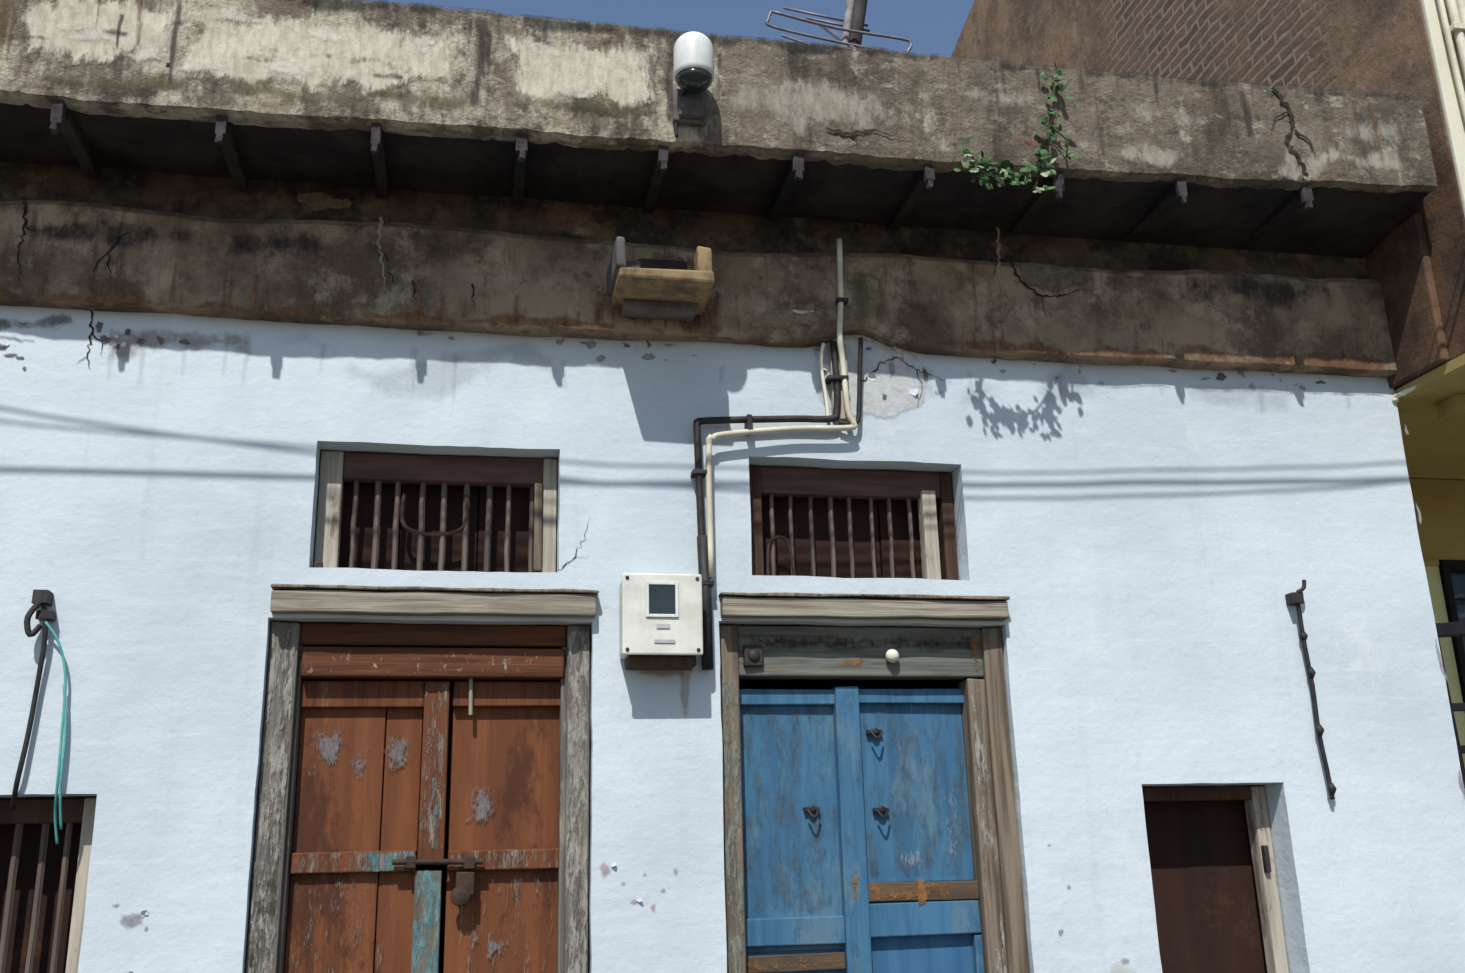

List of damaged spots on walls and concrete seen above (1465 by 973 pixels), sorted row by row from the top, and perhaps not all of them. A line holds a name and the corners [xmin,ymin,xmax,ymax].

leakage [169,3,181,83]
leakage [304,0,433,12]
leakage [523,14,687,120]
crack [1271,86,1317,176]
crack [17,200,38,283]
crack [77,232,131,369]
peeling [96,321,191,349]
spalling [814,335,940,418]
crack [993,227,1079,316]